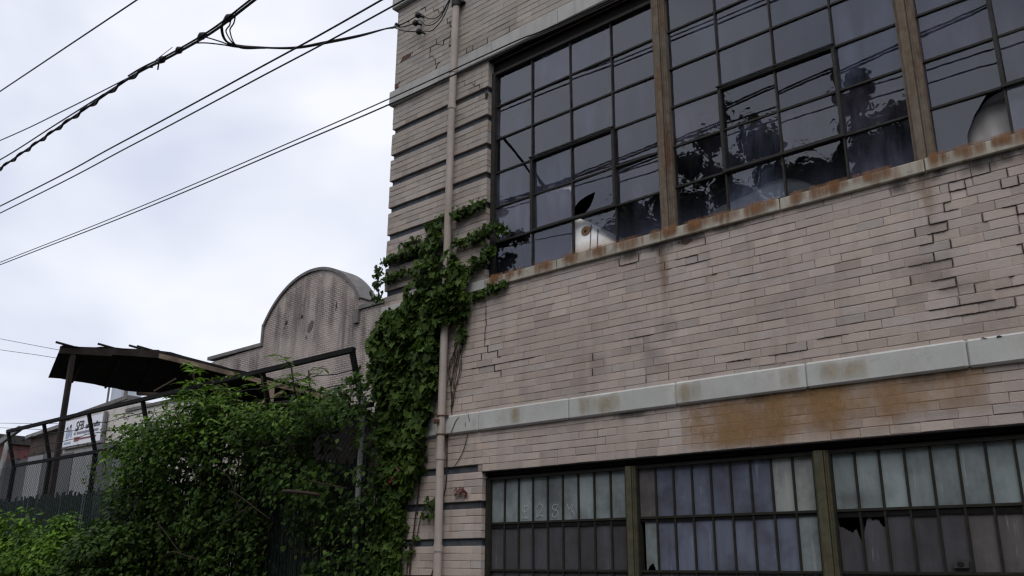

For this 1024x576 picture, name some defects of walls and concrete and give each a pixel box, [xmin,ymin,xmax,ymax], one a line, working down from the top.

crack [908,163,1024,321]
crack [473,300,532,372]